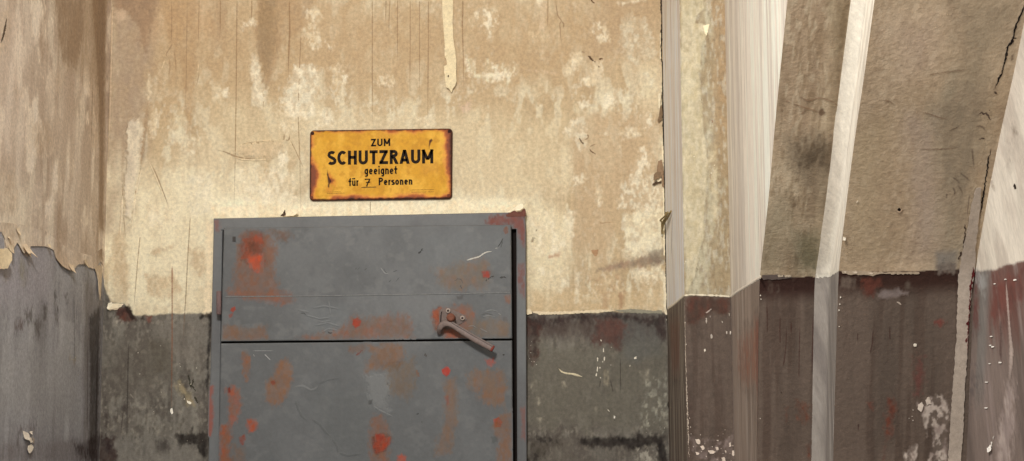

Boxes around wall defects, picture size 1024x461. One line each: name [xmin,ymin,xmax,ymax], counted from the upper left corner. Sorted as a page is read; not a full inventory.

crack [994,7,1024,94]
peeling [0,222,123,311]
damp [53,0,238,418]
peeling [201,0,798,461]
peeling [902,393,951,461]